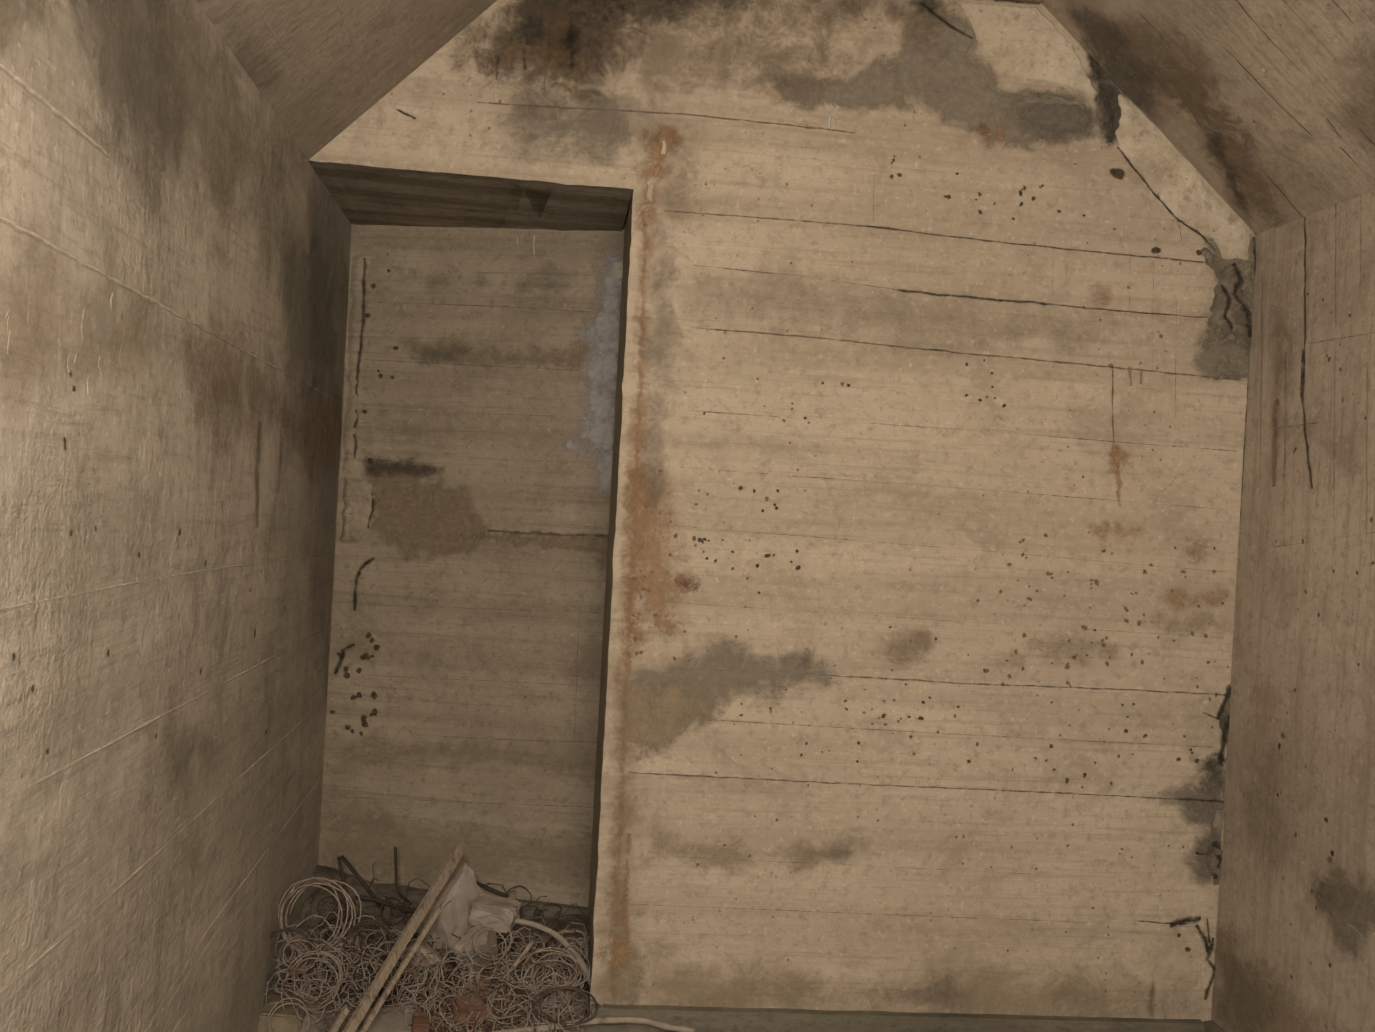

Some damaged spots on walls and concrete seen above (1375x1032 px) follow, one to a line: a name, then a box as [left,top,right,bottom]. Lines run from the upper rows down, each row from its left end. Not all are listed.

water stain [469,0,750,147]
rust [639,126,681,228]
crack [668,147,1216,263]
spalling [1110,168,1125,180]
water stain [1073,13,1279,226]
spalling [1196,237,1256,385]
water stain [1197,236,1256,378]
water stain [366,459,608,559]
rust [626,405,699,657]
water stain [625,642,830,745]
spalling [1203,684,1231,766]
spalling [1205,937,1216,1000]